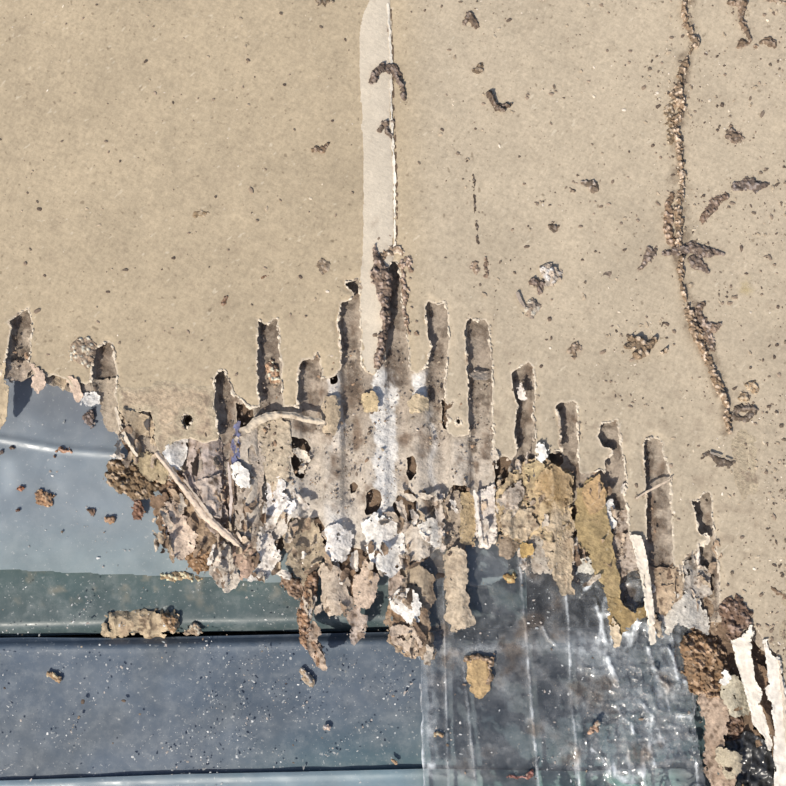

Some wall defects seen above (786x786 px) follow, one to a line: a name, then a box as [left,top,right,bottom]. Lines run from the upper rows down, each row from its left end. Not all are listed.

peeling [469,257,491,278]
peeling [710,429,759,501]
spalling [0,359,601,671]
spalling [589,480,786,786]
peeling [463,653,495,699]